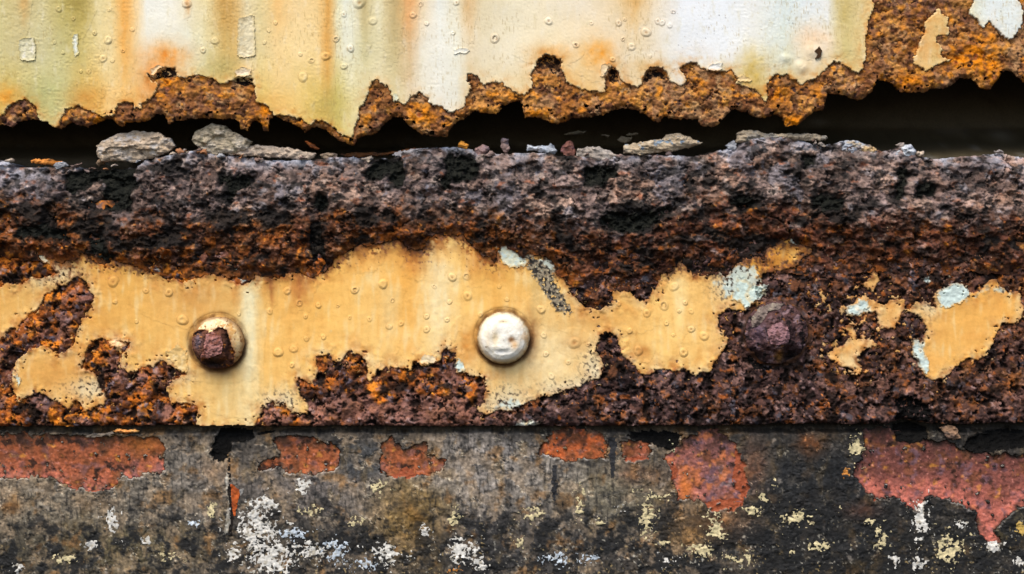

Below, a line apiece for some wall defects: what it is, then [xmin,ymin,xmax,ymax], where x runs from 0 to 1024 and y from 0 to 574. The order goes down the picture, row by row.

rust [0,72,39,127]
rust [59,0,1024,161]
rust [0,257,223,437]
rust [128,238,436,329]
rust [460,238,492,292]
peeling [498,246,528,269]
peeling [845,298,869,315]
peeling [921,274,969,308]
rust [255,248,1024,574]
peeling [0,431,166,491]
peeling [538,426,747,518]
peeling [849,425,1024,548]